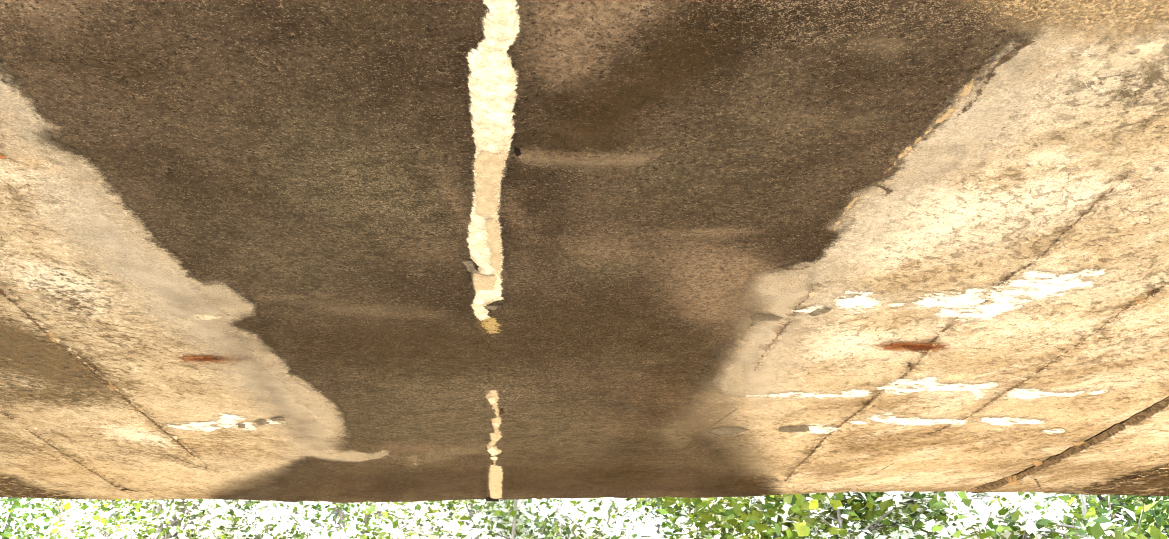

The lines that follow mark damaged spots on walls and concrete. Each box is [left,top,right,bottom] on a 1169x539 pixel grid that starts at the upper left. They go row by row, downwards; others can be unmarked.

spalling [974,0,1169,63]
water stain [561,41,710,145]
water stain [43,273,95,307]
rust [179,355,238,364]
rust [876,342,946,354]